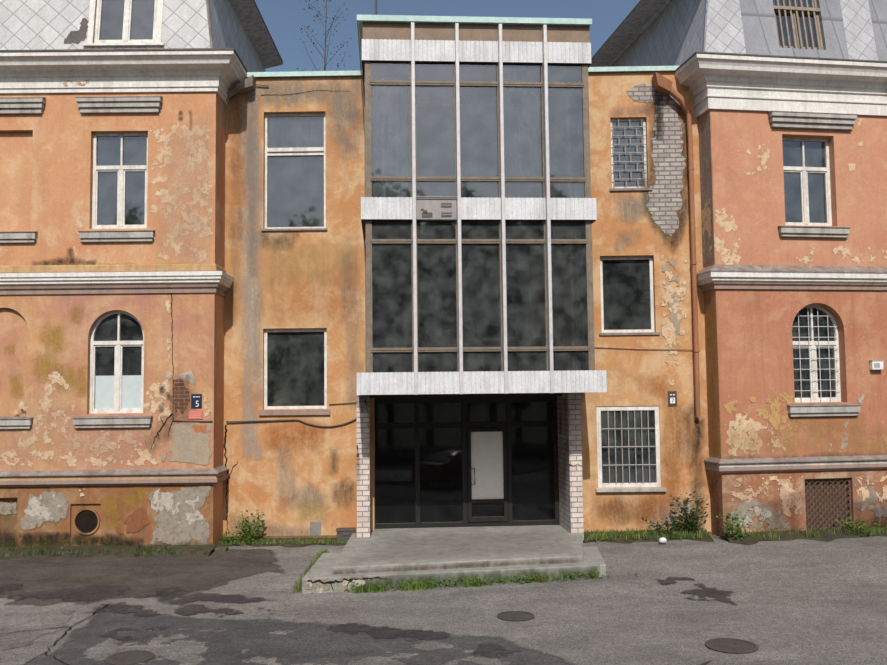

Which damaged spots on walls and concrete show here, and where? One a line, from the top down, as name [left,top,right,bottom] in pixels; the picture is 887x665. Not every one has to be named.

flaking render [0,334,212,468]
crack [151,294,174,448]
peeling [148,121,214,264]
spalling [627,83,686,237]
peeling [661,255,688,385]
peeling [724,392,799,457]
peeling [833,245,887,265]
peeling [0,501,17,515]
peeling [731,476,803,517]
peeling [854,475,887,517]